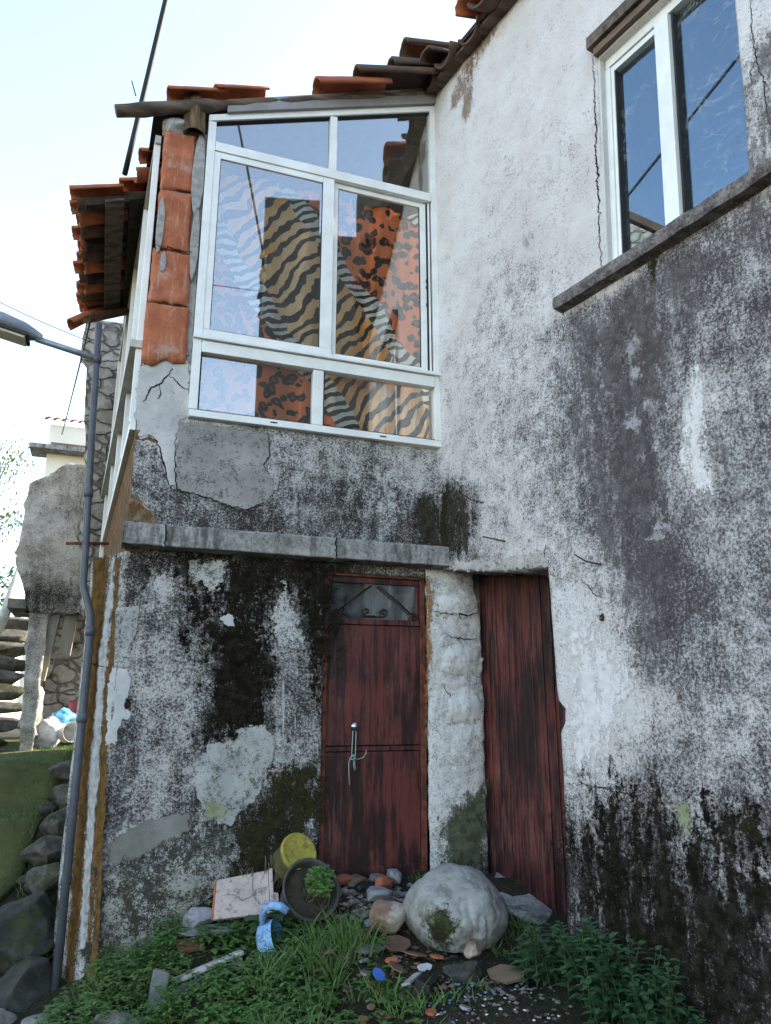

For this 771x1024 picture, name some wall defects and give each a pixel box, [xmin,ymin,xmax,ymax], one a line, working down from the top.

crack [592,58,603,267]
damp [736,28,771,170]
crack [749,2,770,125]
crack [144,368,187,401]
flaking render [133,360,274,510]
damp [406,475,480,567]
damp [545,186,771,683]
peeling [105,564,177,745]
damp [136,549,355,753]
corrosion [65,555,121,982]
spalling [182,725,294,826]
damp [529,745,771,1024]